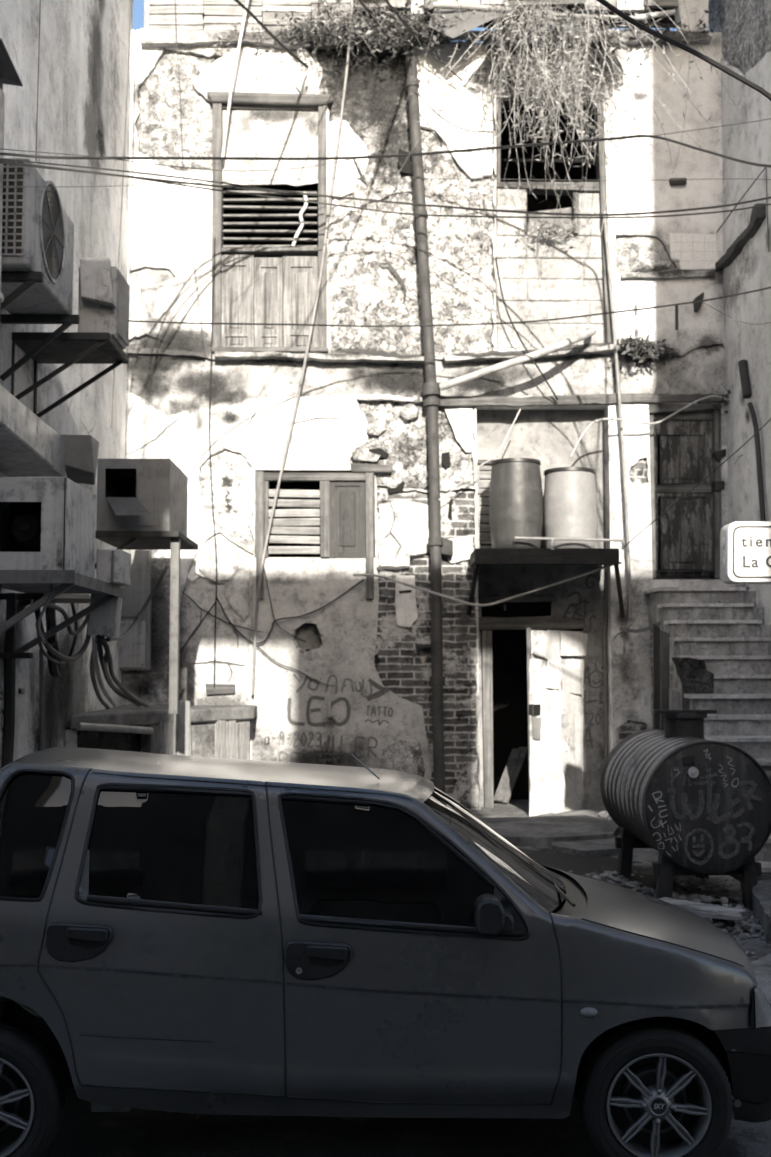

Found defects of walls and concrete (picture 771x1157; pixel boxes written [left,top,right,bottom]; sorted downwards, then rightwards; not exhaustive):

damp [94,0,103,101]
damp [97,115,105,168]
crack [129,416,181,454]
damp [138,331,238,423]
crack [238,404,349,437]
flaking render [127,39,726,810]
crack [181,573,264,682]